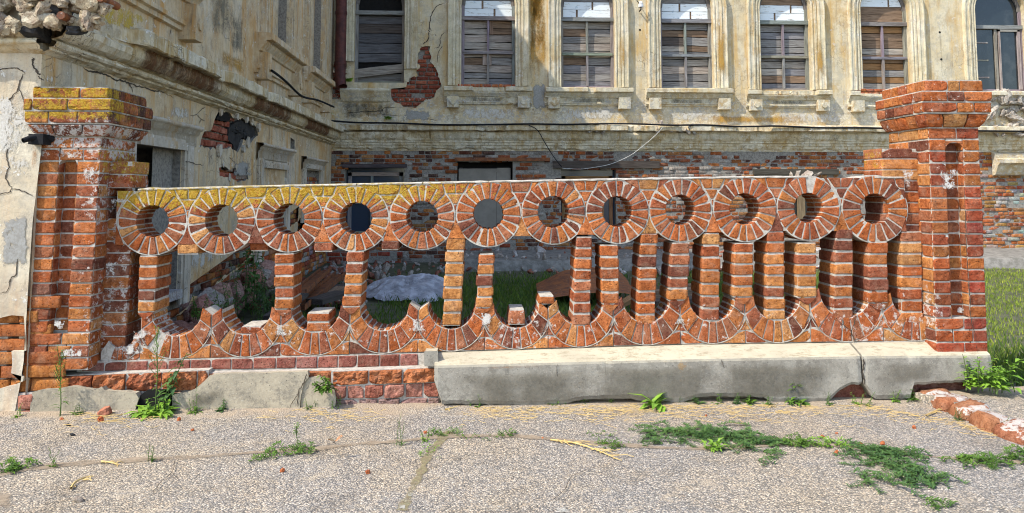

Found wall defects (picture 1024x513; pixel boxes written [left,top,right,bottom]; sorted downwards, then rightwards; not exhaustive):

crack [423,3,444,61]
flaking render [391,42,445,120]
peeling [0,96,29,169]
crack [0,57,44,195]
flaking render [200,108,261,182]
crack [836,309,865,385]